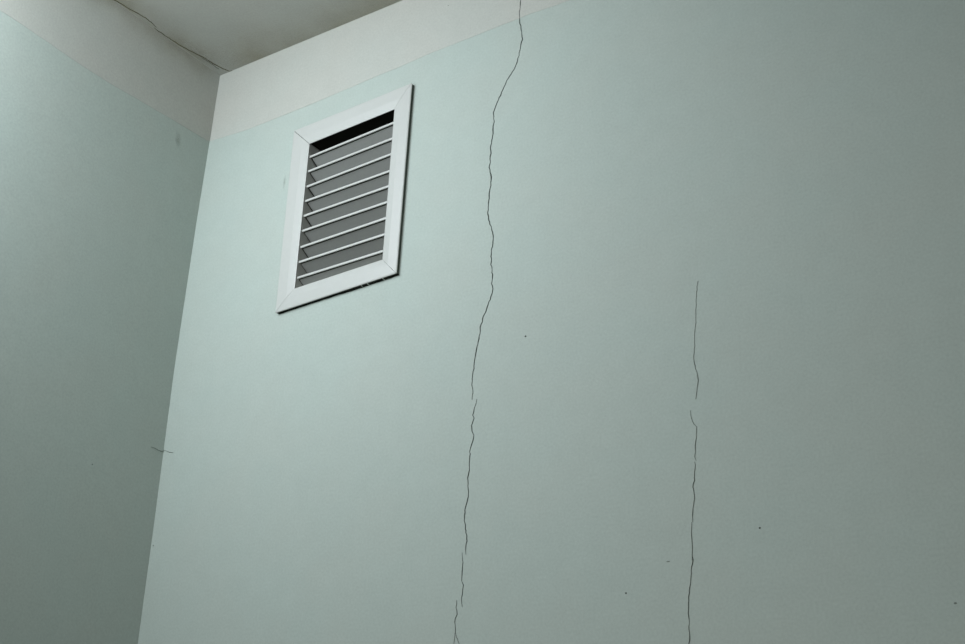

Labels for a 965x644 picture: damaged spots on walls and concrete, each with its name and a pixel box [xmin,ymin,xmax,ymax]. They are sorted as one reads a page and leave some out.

crack [114,0,228,71]
crack [454,0,523,643]
crack [688,282,699,644]